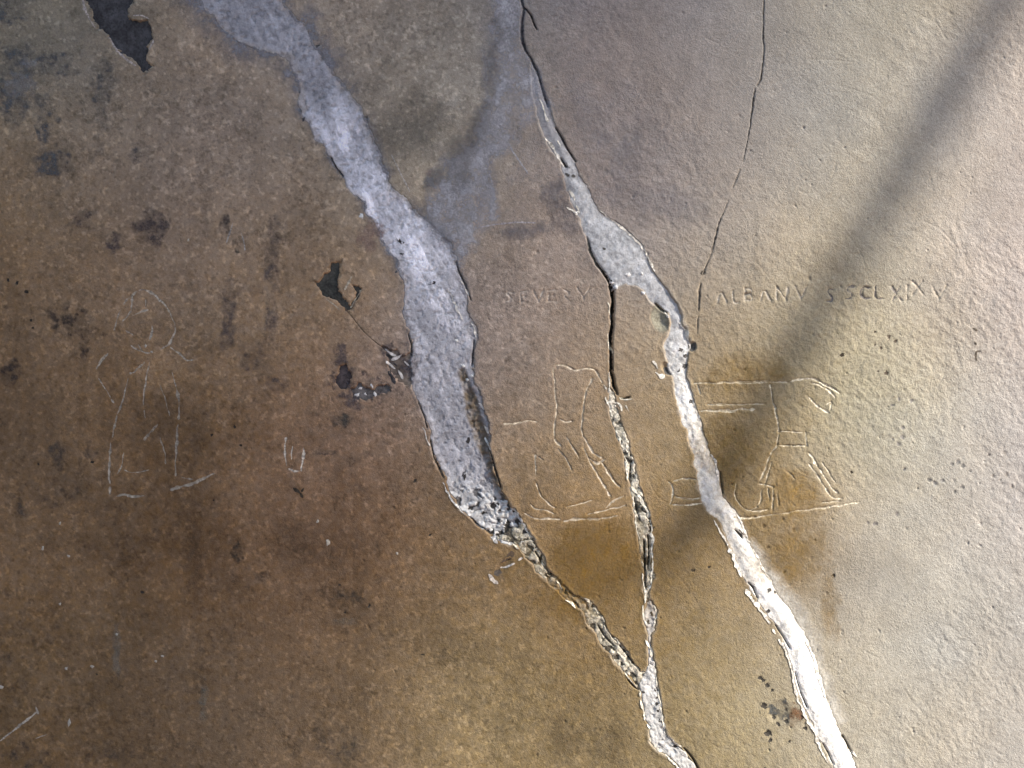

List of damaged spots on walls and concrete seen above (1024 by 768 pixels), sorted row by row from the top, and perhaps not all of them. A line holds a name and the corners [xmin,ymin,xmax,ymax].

spalling [82,0,154,72]
leakage [282,0,336,69]
leakage [411,0,549,266]
spalling [316,262,361,311]
crack [199,0,857,768]